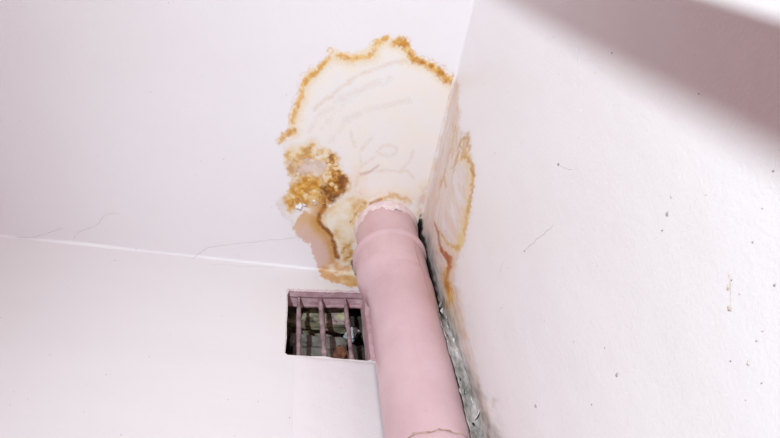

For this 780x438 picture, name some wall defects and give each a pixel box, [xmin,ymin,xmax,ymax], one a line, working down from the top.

water stain [274,32,506,438]